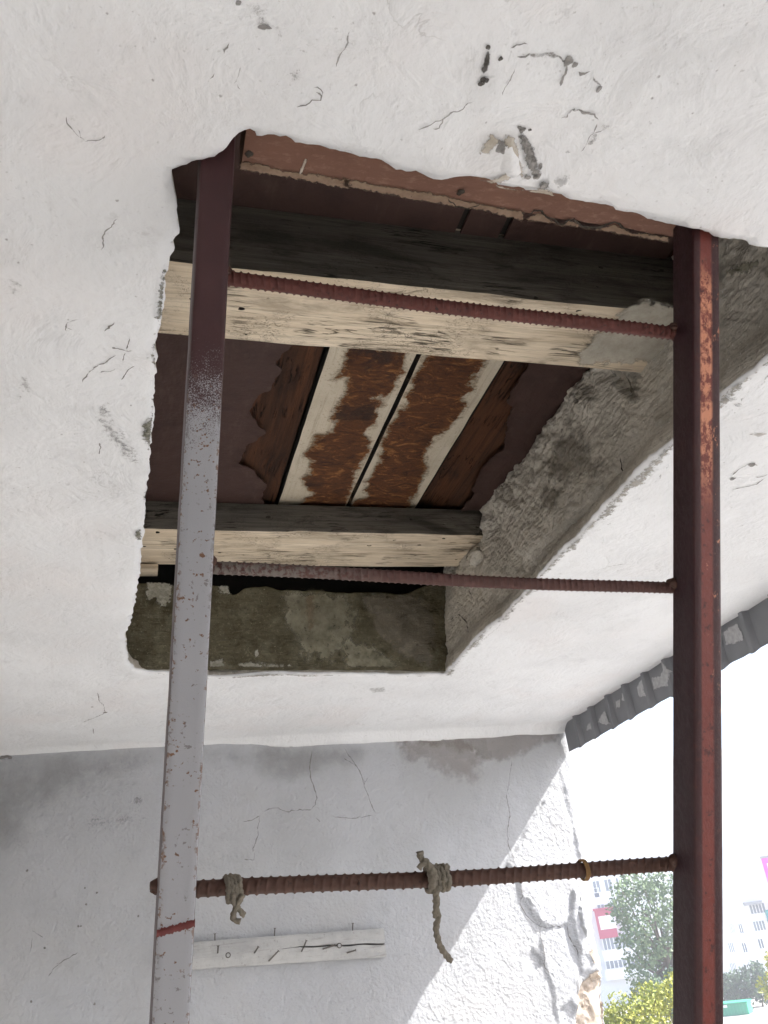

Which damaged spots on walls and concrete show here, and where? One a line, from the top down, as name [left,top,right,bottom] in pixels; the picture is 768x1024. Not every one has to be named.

crack [502,43,602,151]
spalling [480,126,554,196]
peeling [239,162,669,242]
spalling [154,269,166,321]
spalling [142,413,153,449]
peeling [299,348,486,508]
crack [245,751,374,860]